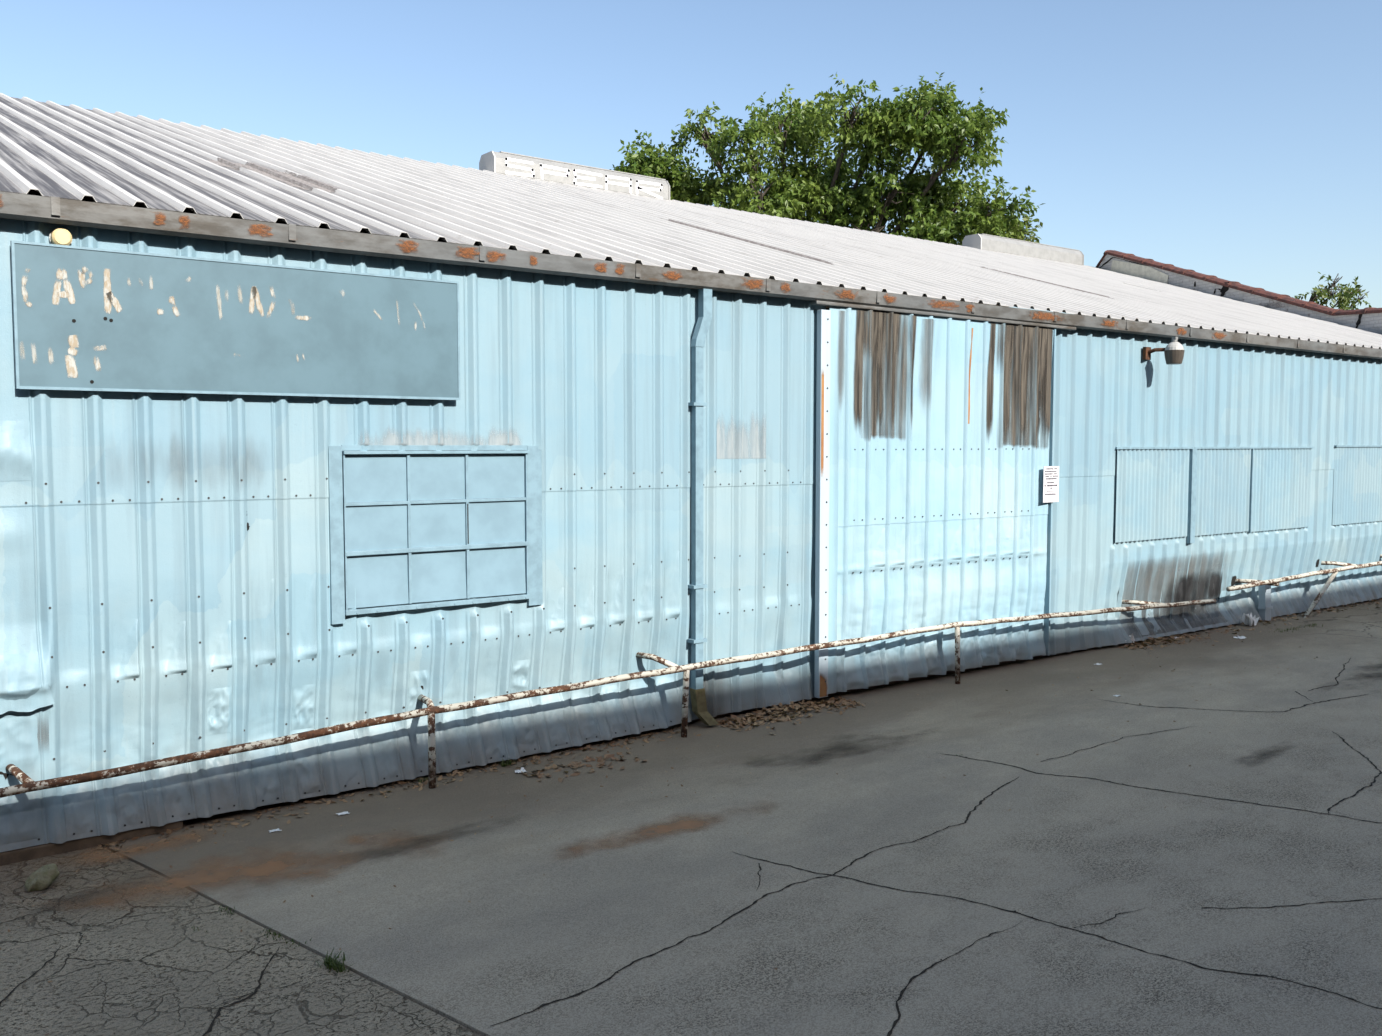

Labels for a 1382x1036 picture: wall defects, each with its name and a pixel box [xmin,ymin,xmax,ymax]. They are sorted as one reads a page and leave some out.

rust [154,213,190,229]
rust [249,224,272,236]
rust [397,240,419,253]
rust [456,247,505,262]
leakage [839,310,933,438]
leakage [987,323,1053,448]
leakage [1178,578,1191,601]
leakage [1209,575,1222,597]
crack [492,658,1382,1036]
crack [0,946,61,1006]
crack [199,948,299,1036]